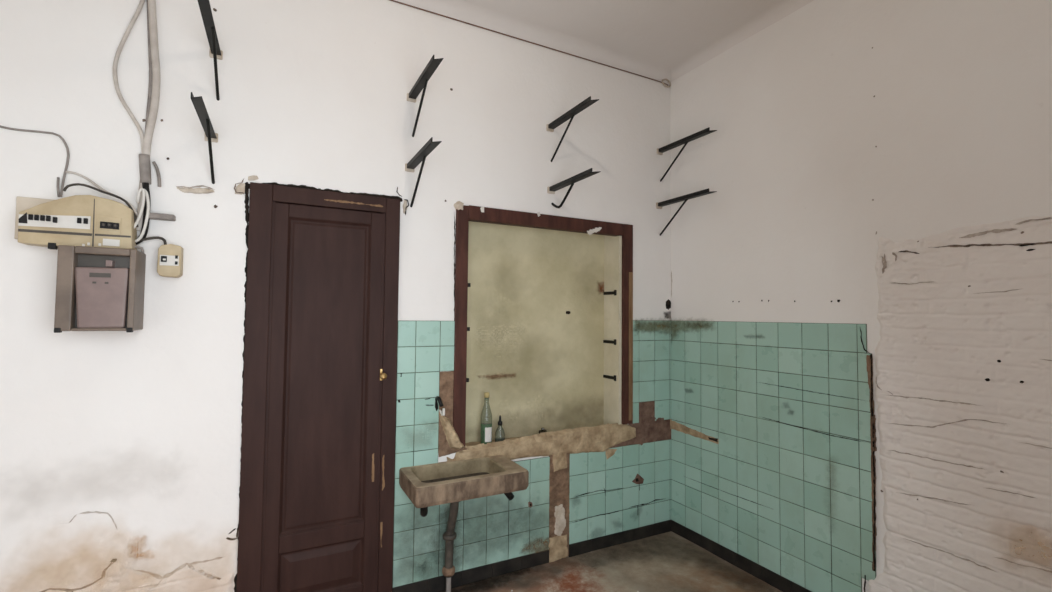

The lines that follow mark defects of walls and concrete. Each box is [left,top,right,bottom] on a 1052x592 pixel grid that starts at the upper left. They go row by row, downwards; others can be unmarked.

crack [875,217,1052,284]
spalling [234,175,409,462]
damp [635,321,709,335]
peeling [435,371,467,457]
spalling [605,401,671,459]
flaking render [860,216,1052,592]
crack [69,511,117,529]
crack [41,528,238,592]
peeling [55,558,238,592]